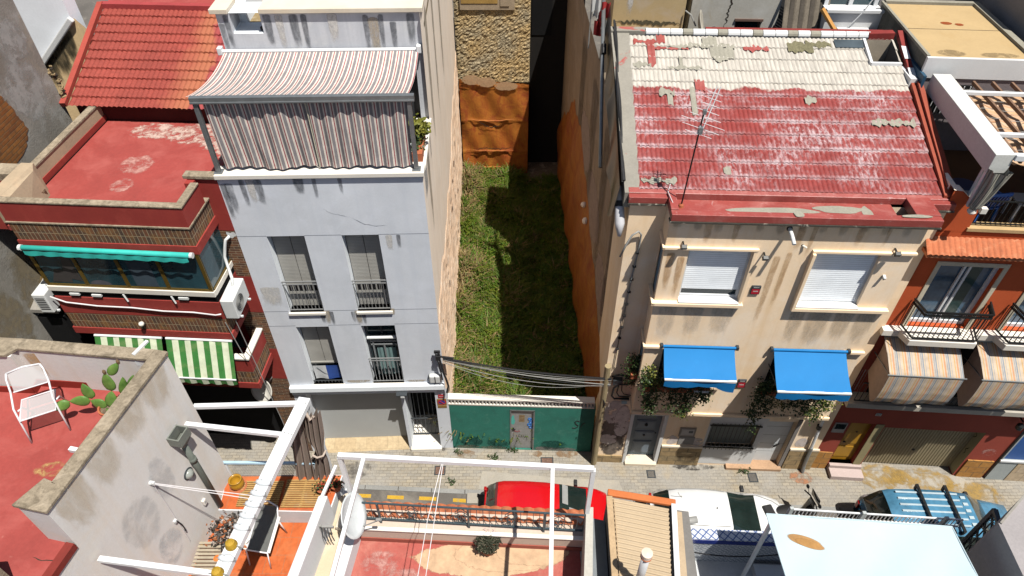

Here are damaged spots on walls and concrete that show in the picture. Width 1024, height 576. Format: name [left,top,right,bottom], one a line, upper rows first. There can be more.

flaking render [0,96,28,164]